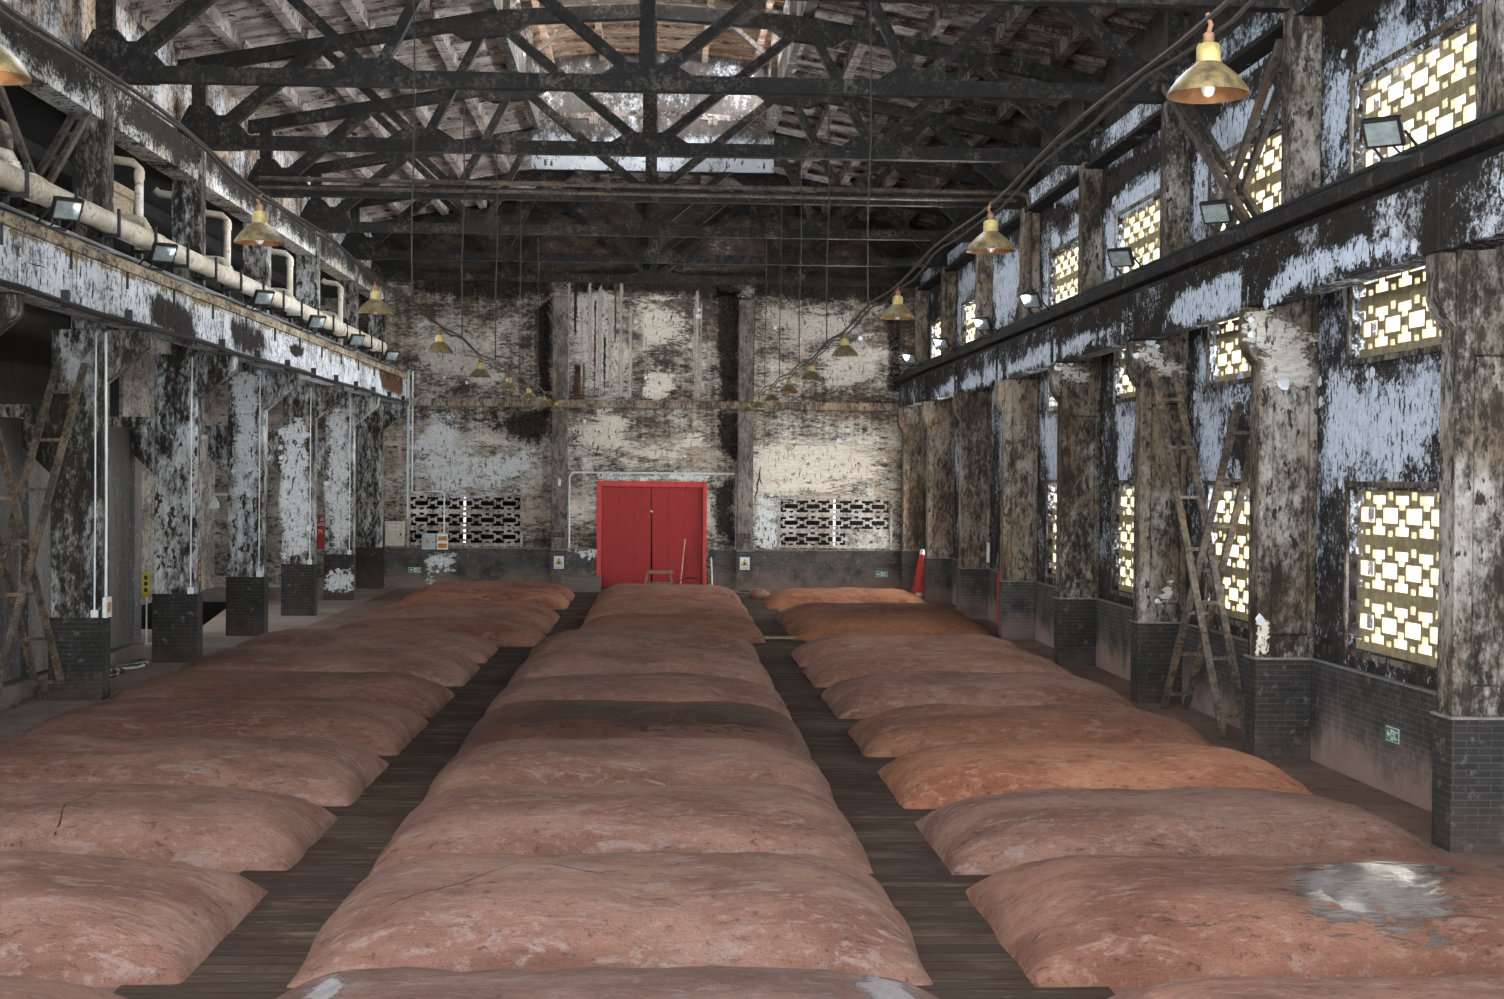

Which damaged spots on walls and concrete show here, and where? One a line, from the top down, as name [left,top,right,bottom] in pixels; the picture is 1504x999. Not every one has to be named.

flaking render [1191,84,1274,234]
flaking render [1322,0,1481,184]
flaking render [229,369,355,593]
flaking render [568,408,711,482]
leakage [410,272,901,545]
flaking render [753,435,892,549]
flaking render [934,227,1441,501]